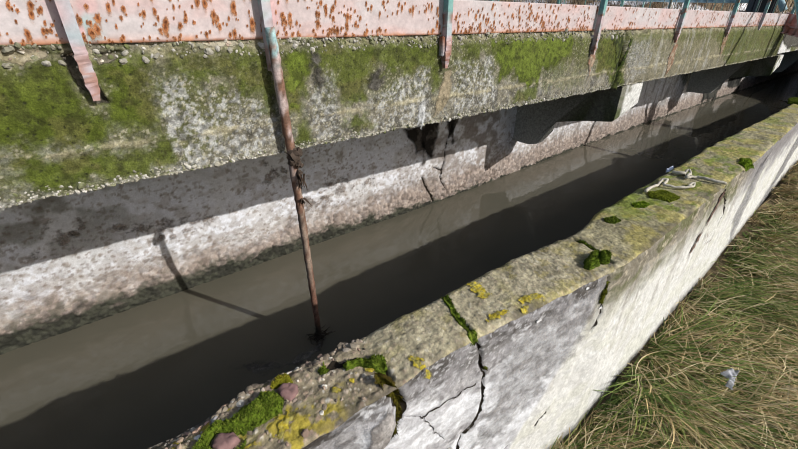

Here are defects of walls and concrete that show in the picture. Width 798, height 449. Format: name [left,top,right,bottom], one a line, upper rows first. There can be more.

rust [0,0,63,46]
rust [76,0,132,44]
rust [137,0,262,42]
rust [275,0,301,39]
rust [298,0,441,38]
rust [453,3,598,34]
crack [421,128,451,201]
leakage [59,218,85,246]
leakage [112,216,213,241]
crack [327,358,364,370]
crack [378,297,485,449]